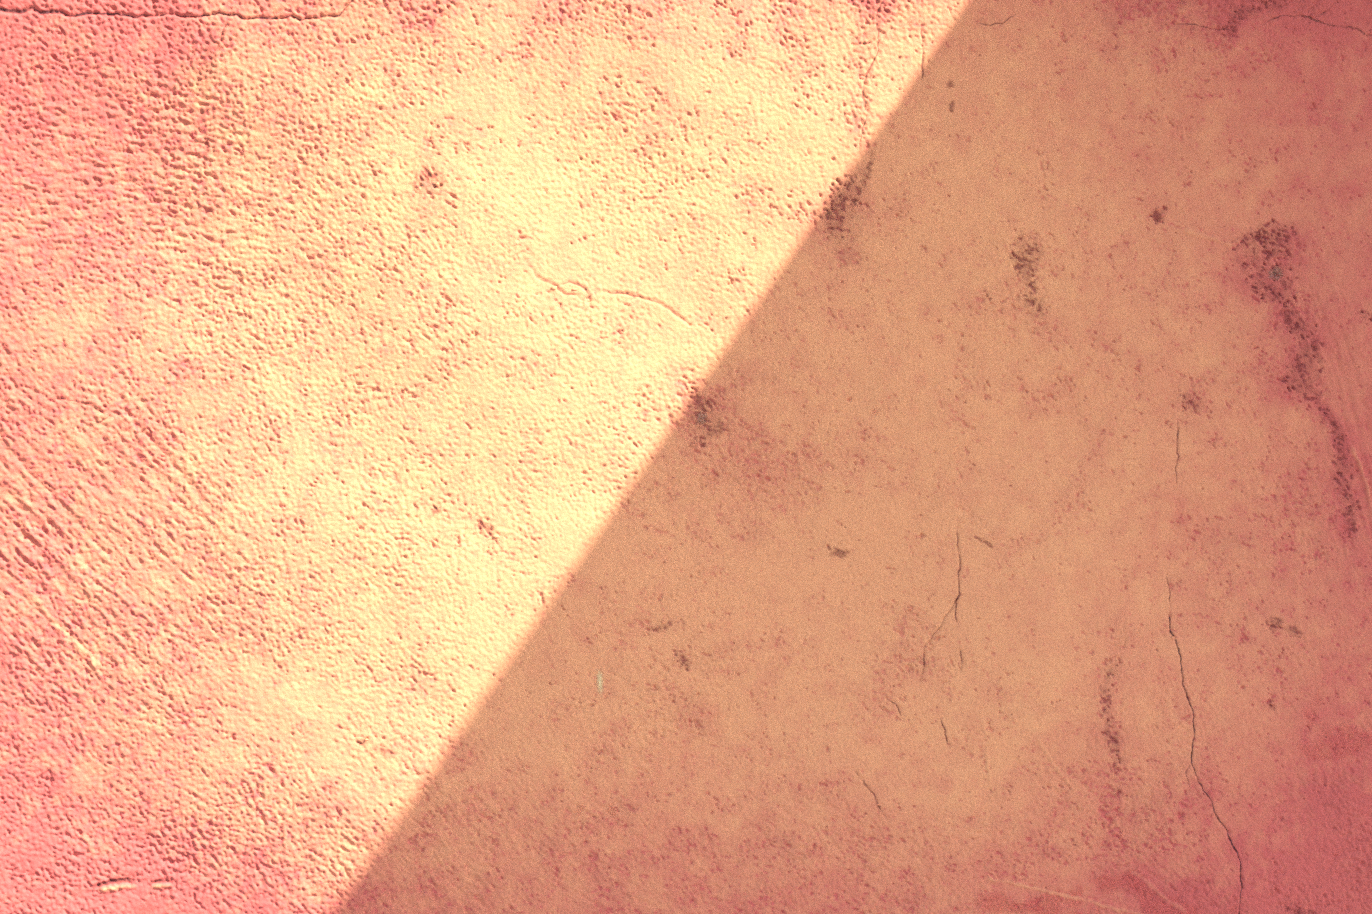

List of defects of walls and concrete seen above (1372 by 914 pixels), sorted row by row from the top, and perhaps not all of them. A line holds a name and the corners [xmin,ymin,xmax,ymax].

crack [0,0,353,32]
crack [1167,581,1242,900]